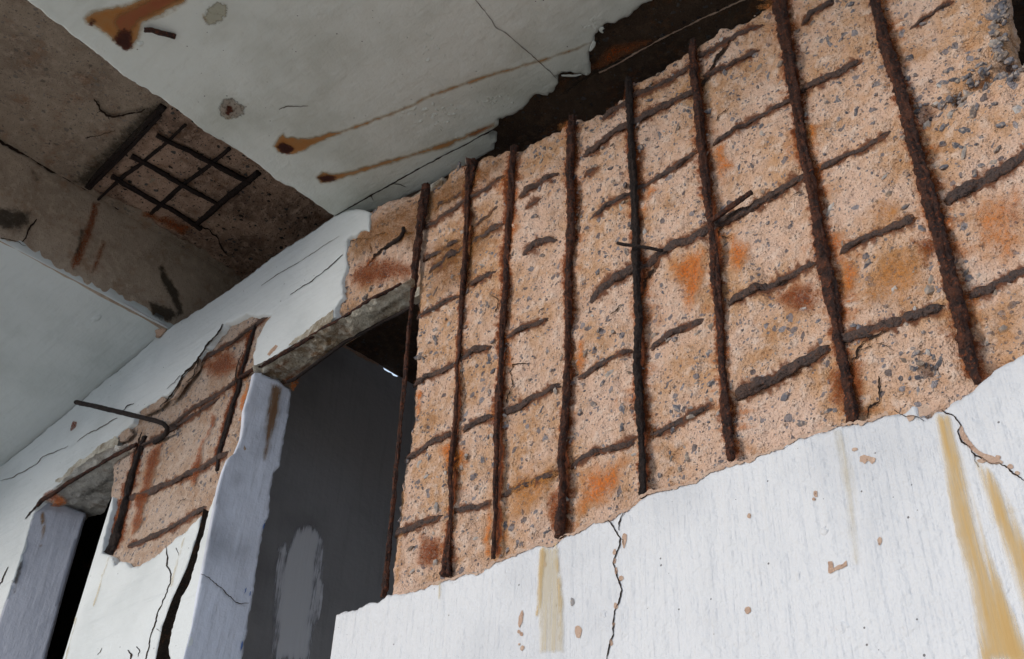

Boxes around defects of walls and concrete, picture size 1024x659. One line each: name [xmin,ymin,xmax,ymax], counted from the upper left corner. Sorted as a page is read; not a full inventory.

corrosion [85,0,185,51]
spalling [85,103,334,280]
corrosion [317,126,491,183]
corrosion [274,58,549,154]
crack [476,0,744,92]
spalling [252,0,1024,598]
spalling [36,317,270,520]
spalling [104,372,254,567]
crack [128,498,244,659]
crack [606,513,624,659]
crack [867,376,1024,481]
corrosion [938,416,1024,659]